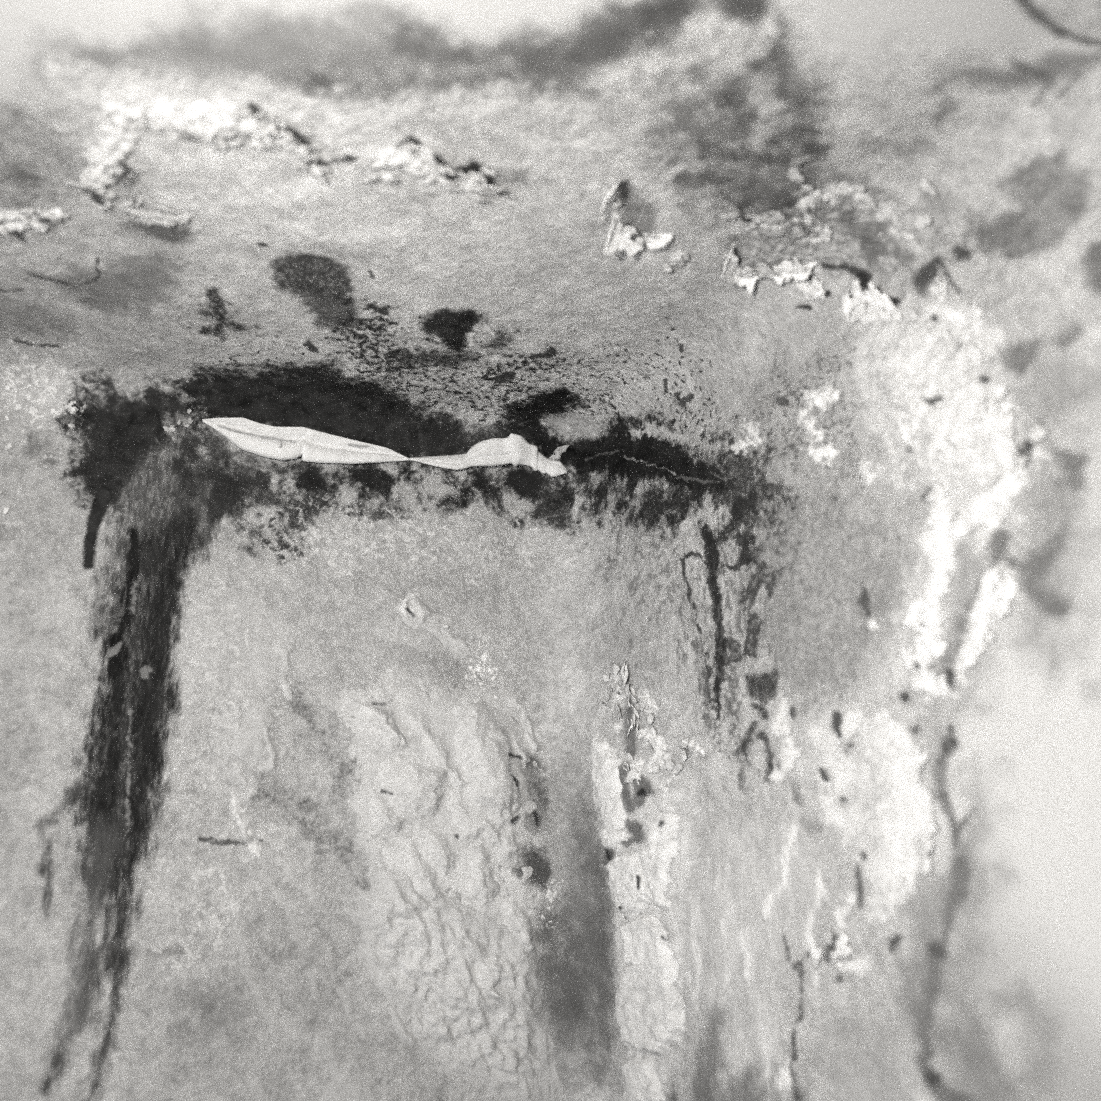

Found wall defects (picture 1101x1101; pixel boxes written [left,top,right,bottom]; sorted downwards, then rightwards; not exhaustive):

peeling [0,201,70,251]
peeling [34,52,708,274]
leakage [579,0,692,59]
leakage [652,21,827,215]
leakage [721,0,763,17]
peeling [720,158,977,327]
leakage [0,254,1086,1101]
peeling [590,661,708,1101]
peeling [769,697,937,981]
crack [783,934,810,1101]